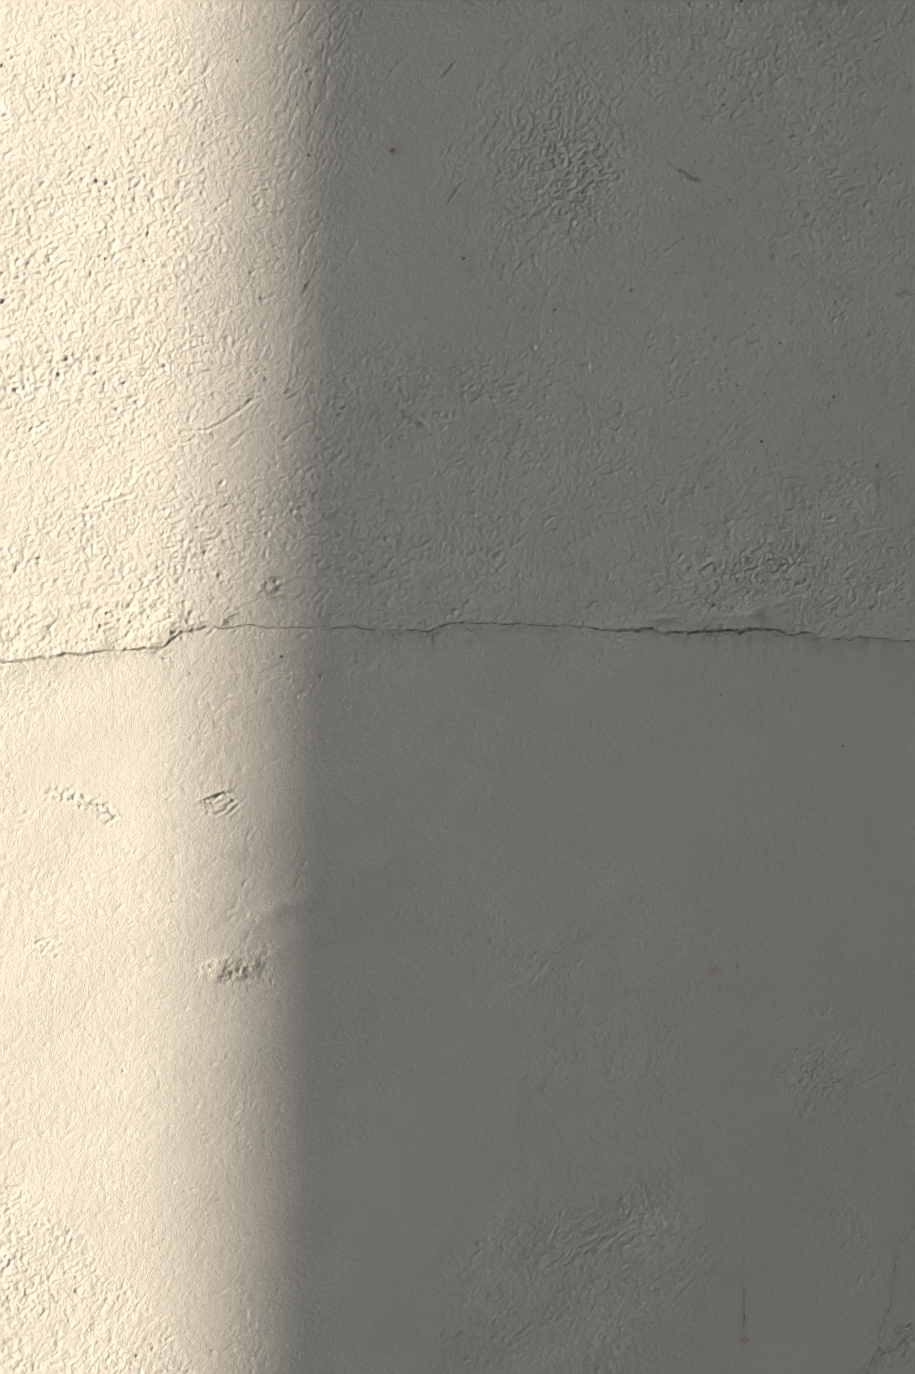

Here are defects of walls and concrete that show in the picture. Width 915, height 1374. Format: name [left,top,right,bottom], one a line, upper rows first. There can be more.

crack [0,612,915,664]